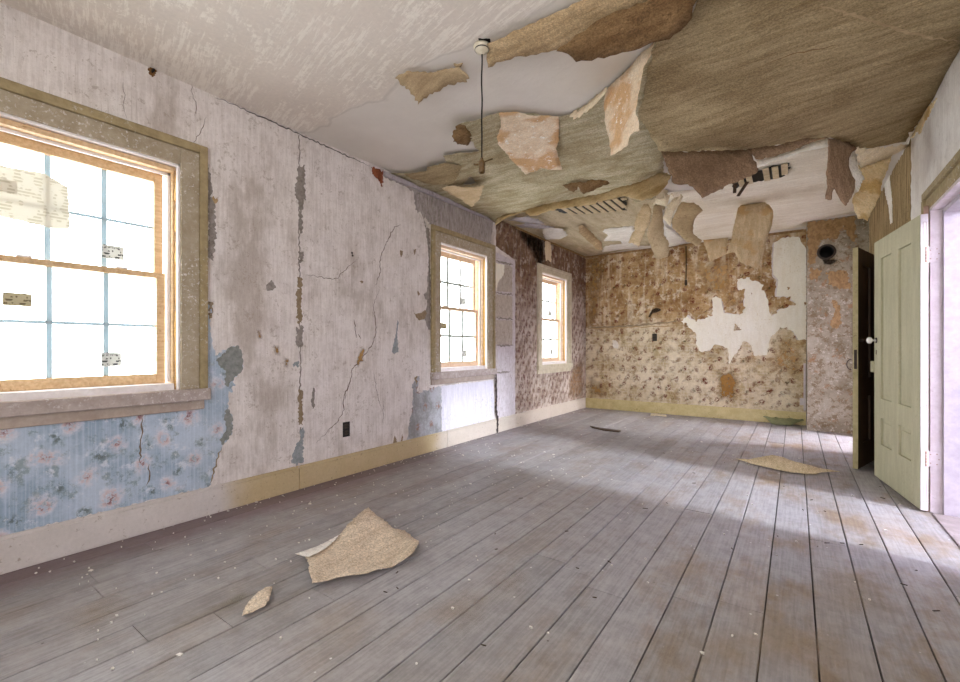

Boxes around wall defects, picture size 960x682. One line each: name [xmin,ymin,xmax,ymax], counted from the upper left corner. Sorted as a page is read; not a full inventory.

spalling [294,163,306,234]
peeling [869,139,912,254]
crack [298,201,354,279]
flaking render [602,226,651,252]
spalling [293,277,304,370]
crack [296,323,304,389]
crack [299,225,399,441]
flaking render [371,167,515,418]
peeling [681,236,806,364]
crack [139,415,151,484]
spalling [291,388,315,467]
crack [493,374,501,433]